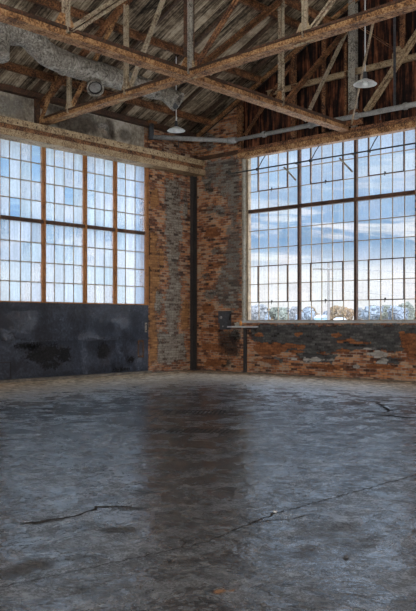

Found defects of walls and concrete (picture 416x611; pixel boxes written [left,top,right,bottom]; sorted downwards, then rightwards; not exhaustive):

peeling [251,323,416,370]
crack [376,400,416,418]
crack [2,475,413,587]